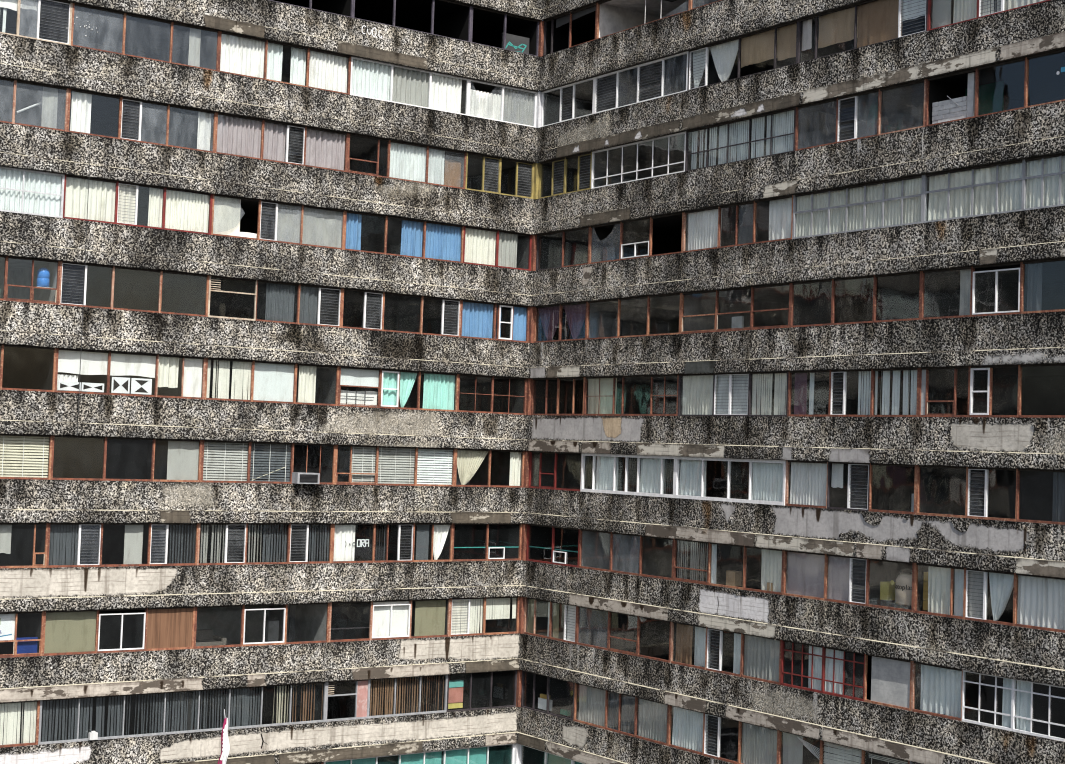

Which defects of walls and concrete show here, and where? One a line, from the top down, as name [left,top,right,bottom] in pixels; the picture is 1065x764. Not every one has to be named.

peeling [731,104,764,117]
spalling [945,418,1038,452]
spalling [0,567,178,598]
spalling [696,589,769,625]
spalling [399,634,519,663]
spalling [0,743,91,764]